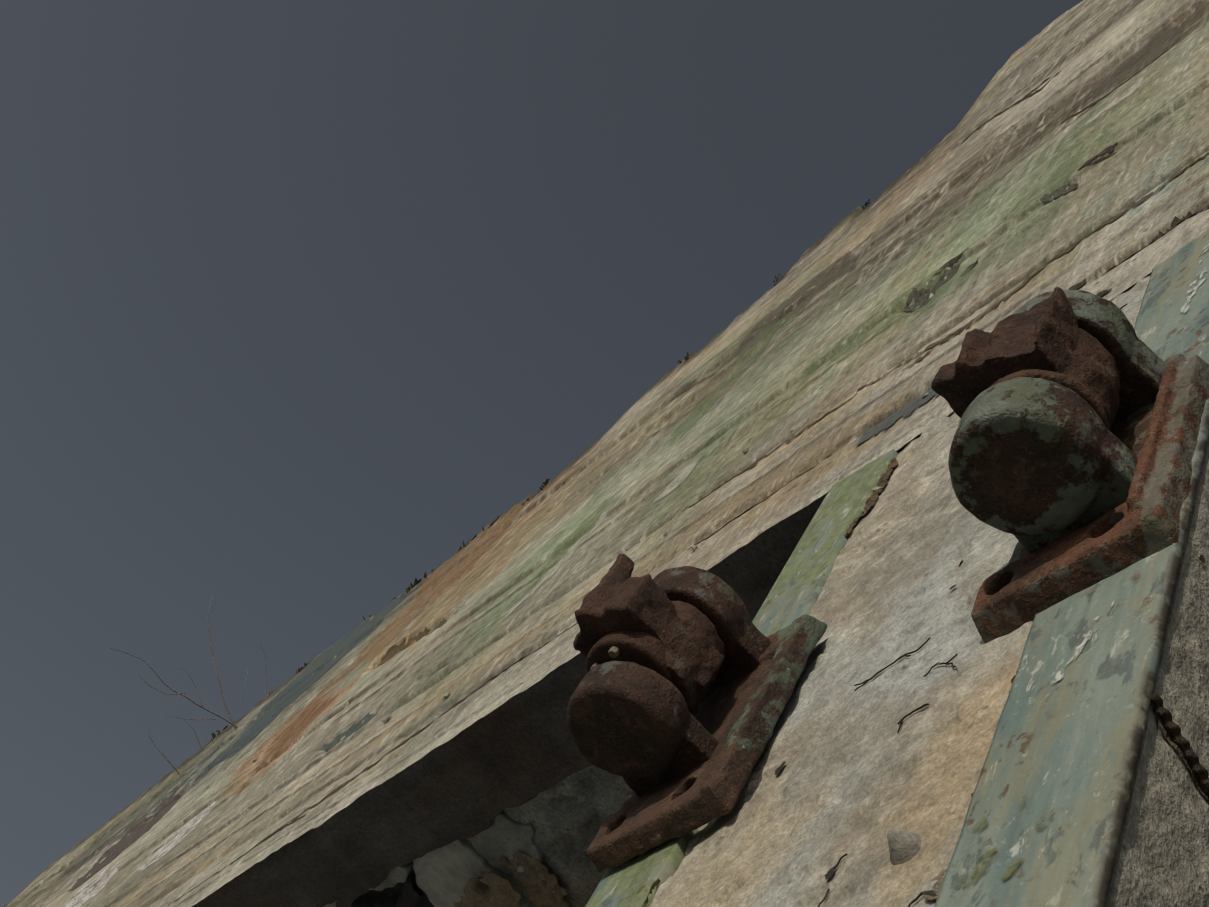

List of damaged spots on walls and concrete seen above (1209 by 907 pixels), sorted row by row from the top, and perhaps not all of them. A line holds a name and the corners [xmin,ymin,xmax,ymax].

peeling [1180,244,1209,313]
peeling [1047,616,1099,695]
spalling [69,795,180,891]
flaking render [352,811,571,907]